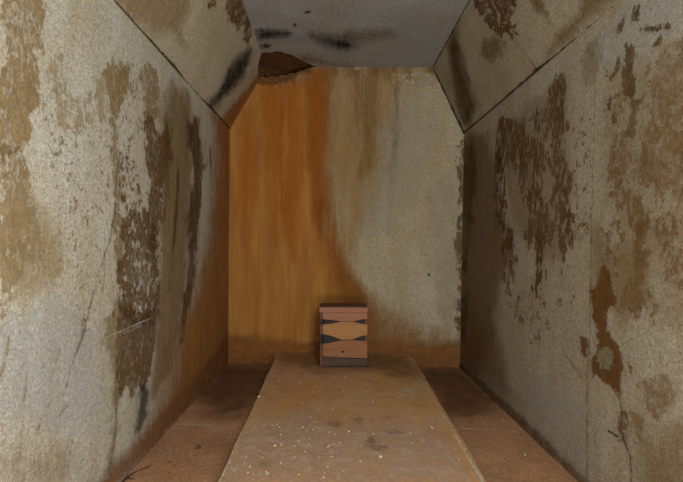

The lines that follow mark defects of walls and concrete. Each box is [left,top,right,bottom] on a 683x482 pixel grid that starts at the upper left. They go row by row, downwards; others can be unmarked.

water stain [210,49,251,107]
water stain [260,30,289,48]
spalling [251,51,315,79]
water stain [137,85,211,431]
rust [163,72,363,416]
crack [611,386,632,480]